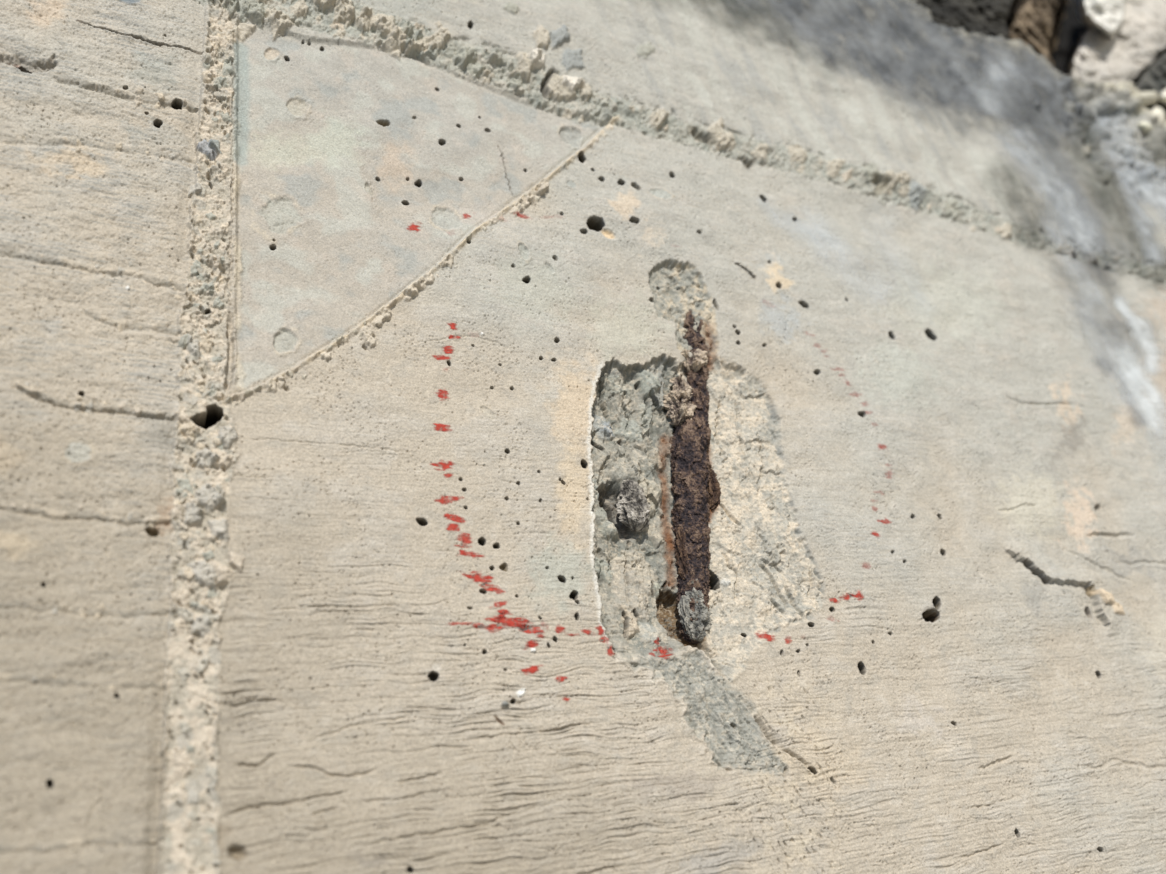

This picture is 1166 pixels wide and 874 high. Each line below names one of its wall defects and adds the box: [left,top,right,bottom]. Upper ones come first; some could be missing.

spalling [589,257,826,782]
corrosion [707,469,721,518]
corrosion [665,527,691,580]